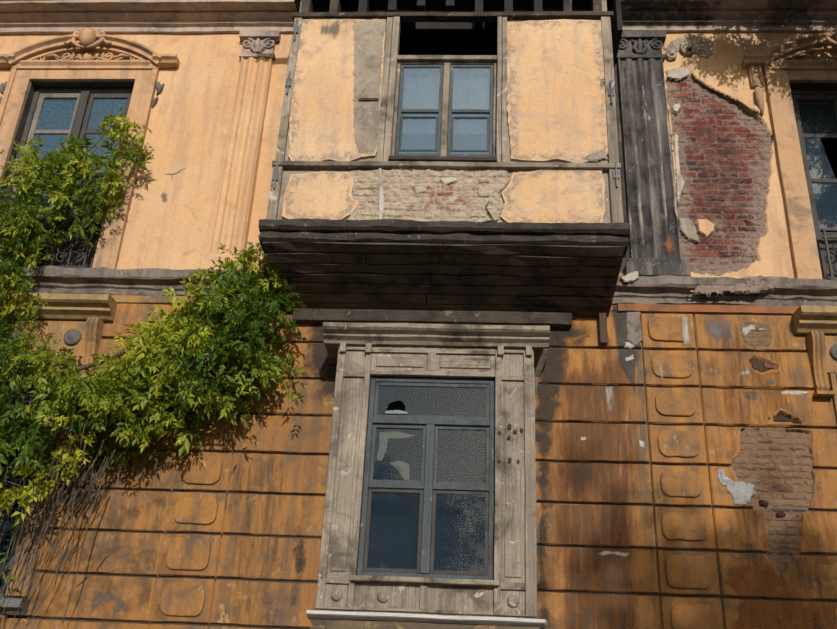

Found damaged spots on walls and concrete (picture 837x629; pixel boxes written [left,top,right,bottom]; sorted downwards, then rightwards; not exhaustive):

leakage [621,0,718,29]
flaking render [323,20,386,159]
flaking render [314,168,542,222]
flaking render [663,33,773,276]
flaking render [624,311,643,362]
flaking render [740,324,778,372]
leakage [535,333,568,496]
flaking render [717,408,813,573]
leakage [537,506,547,590]